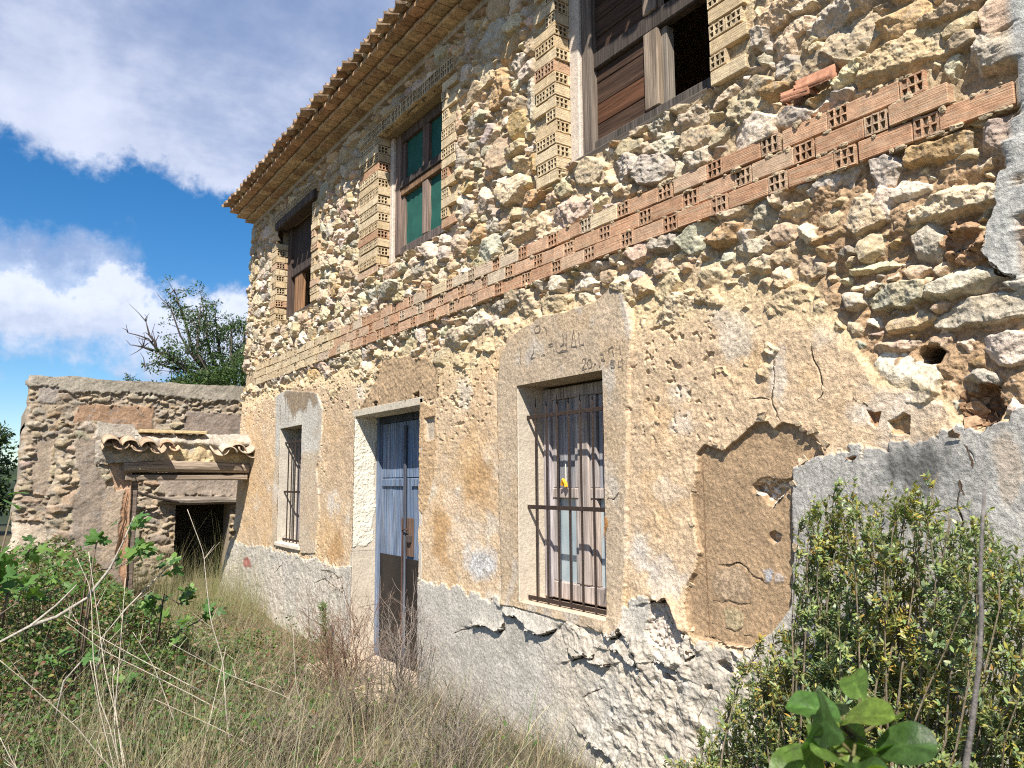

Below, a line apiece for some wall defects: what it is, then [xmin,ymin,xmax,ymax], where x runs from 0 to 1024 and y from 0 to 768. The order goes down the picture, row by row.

crack [749,353,780,419]
spalling [866,410,911,434]
spalling [948,382,1008,438]
flaking render [643,412,830,672]